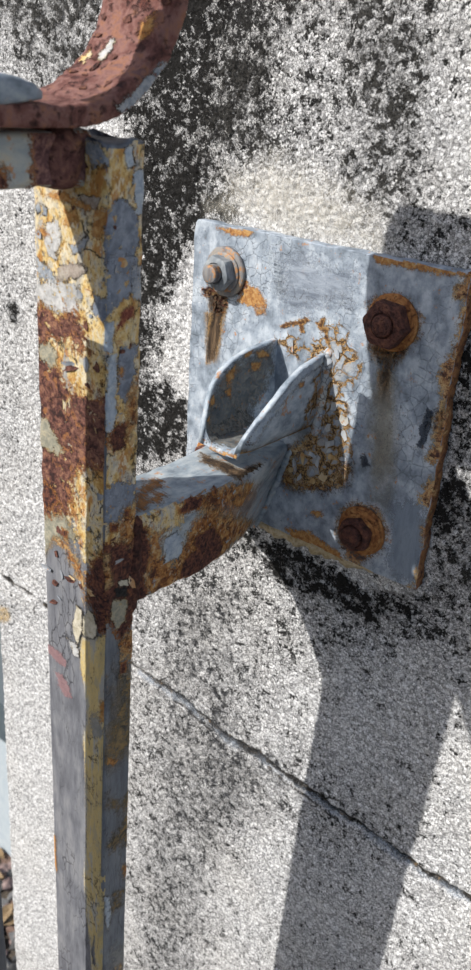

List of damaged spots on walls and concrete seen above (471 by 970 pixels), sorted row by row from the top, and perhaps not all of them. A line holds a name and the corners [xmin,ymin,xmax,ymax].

leakage [0,0,98,84]
corrosion [66,33,118,89]
peeling [34,138,185,596]
leakage [124,0,318,464]
corrosion [216,227,253,238]
corrosion [201,280,268,365]
leakage [329,0,449,250]
corrosion [367,255,471,548]
crack [2,574,48,608]
corrosion [37,301,325,769]
corrosion [103,792,128,850]
crack [131,661,471,902]